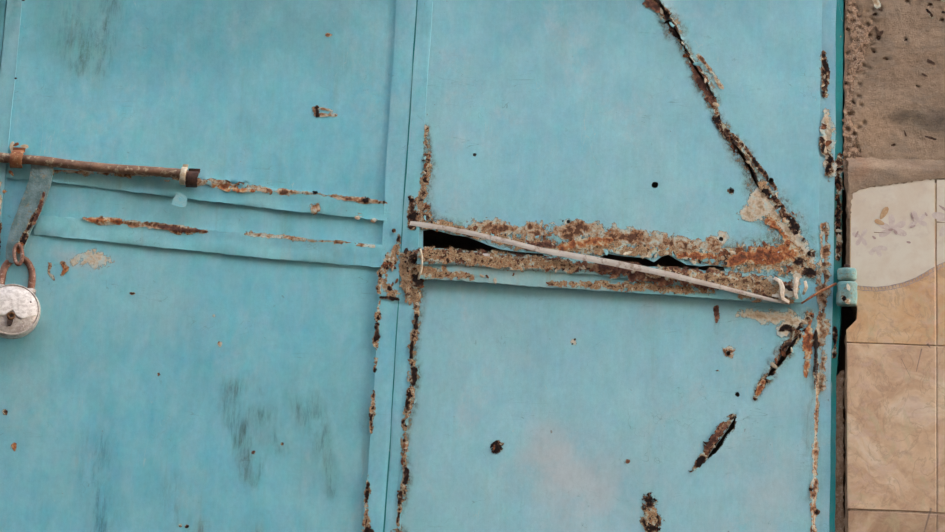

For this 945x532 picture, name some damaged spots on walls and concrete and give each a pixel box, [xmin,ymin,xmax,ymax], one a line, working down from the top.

rust [834,153,844,261]